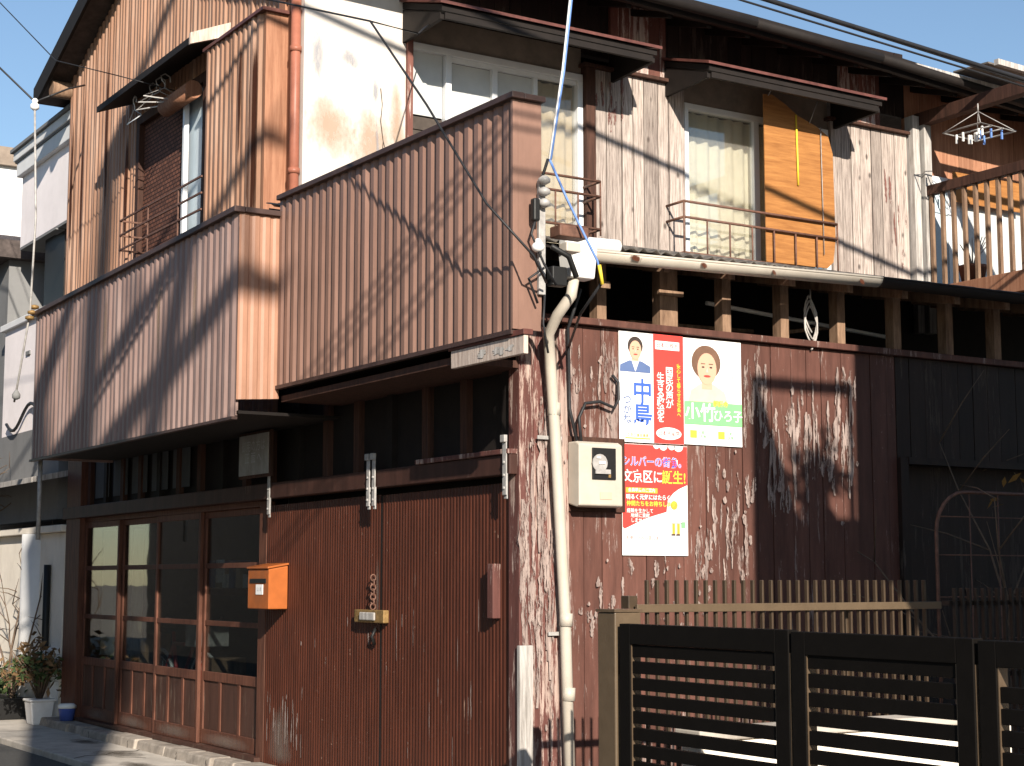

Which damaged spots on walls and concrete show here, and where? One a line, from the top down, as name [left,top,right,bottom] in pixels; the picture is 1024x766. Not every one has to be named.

water stain [363,96,401,155]
peeling [518,398,638,766]
peeling [570,343,618,404]
peeling [652,355,859,614]